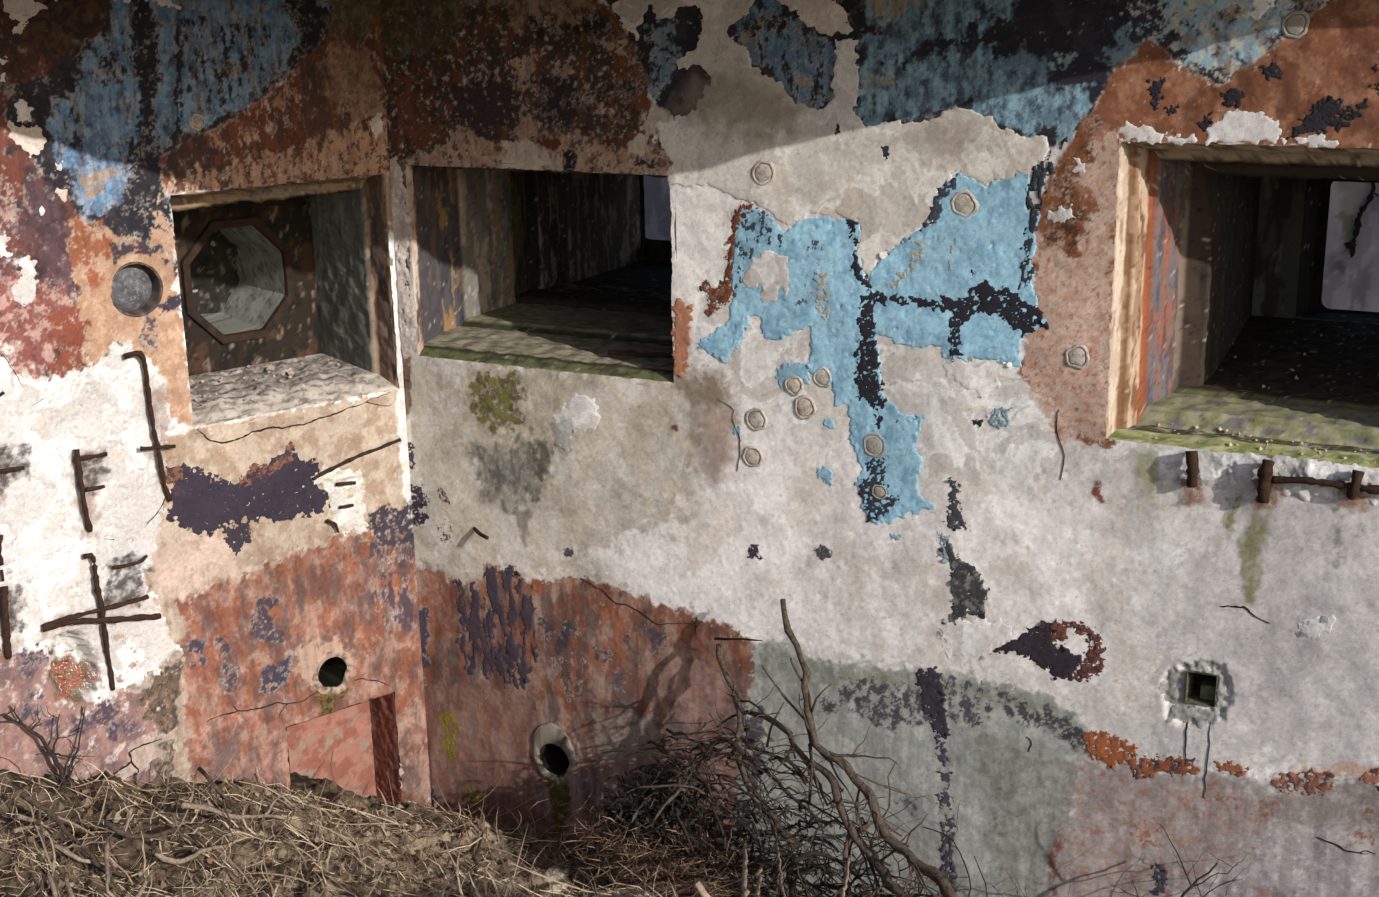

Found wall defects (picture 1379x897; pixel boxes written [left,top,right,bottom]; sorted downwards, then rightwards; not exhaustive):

peeling [3,0,58,34]
peeling [7,99,47,158]
peeling [1116,63,1379,148]
peeling [39,160,68,216]
peeling [0,231,39,309]
crack [195,392,392,444]
peeling [612,0,1109,895]
spalling [0,340,452,692]
rust [1178,477,1204,506]
damp [1239,514,1266,603]
peeling [452,564,539,690]
rust [48,655,101,706]